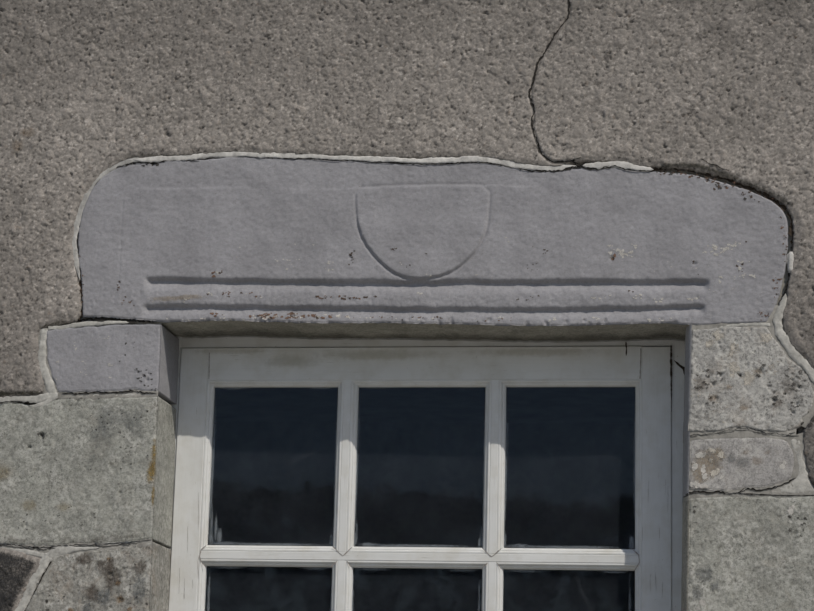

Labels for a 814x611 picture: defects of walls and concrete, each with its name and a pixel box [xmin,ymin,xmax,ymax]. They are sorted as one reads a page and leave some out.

crack [238,0,794,249]